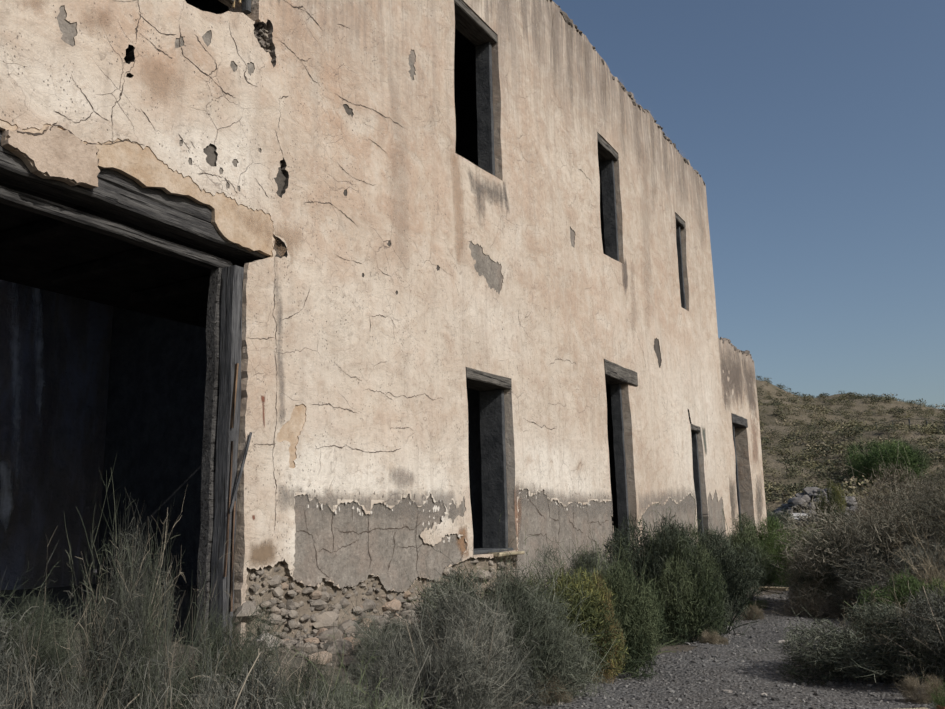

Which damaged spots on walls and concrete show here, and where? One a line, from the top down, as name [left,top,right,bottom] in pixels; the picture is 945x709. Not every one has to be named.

spalling [124,44,135,78]
crack [17,0,257,163]
spalling [253,19,276,68]
crack [282,42,404,128]
peeling [83,138,289,258]
damp [470,174,508,209]
spalling [469,241,504,294]
crack [246,259,310,533]
crack [317,427,411,453]
crack [300,504,427,577]
spalling [283,489,467,592]
spalling [517,489,615,589]